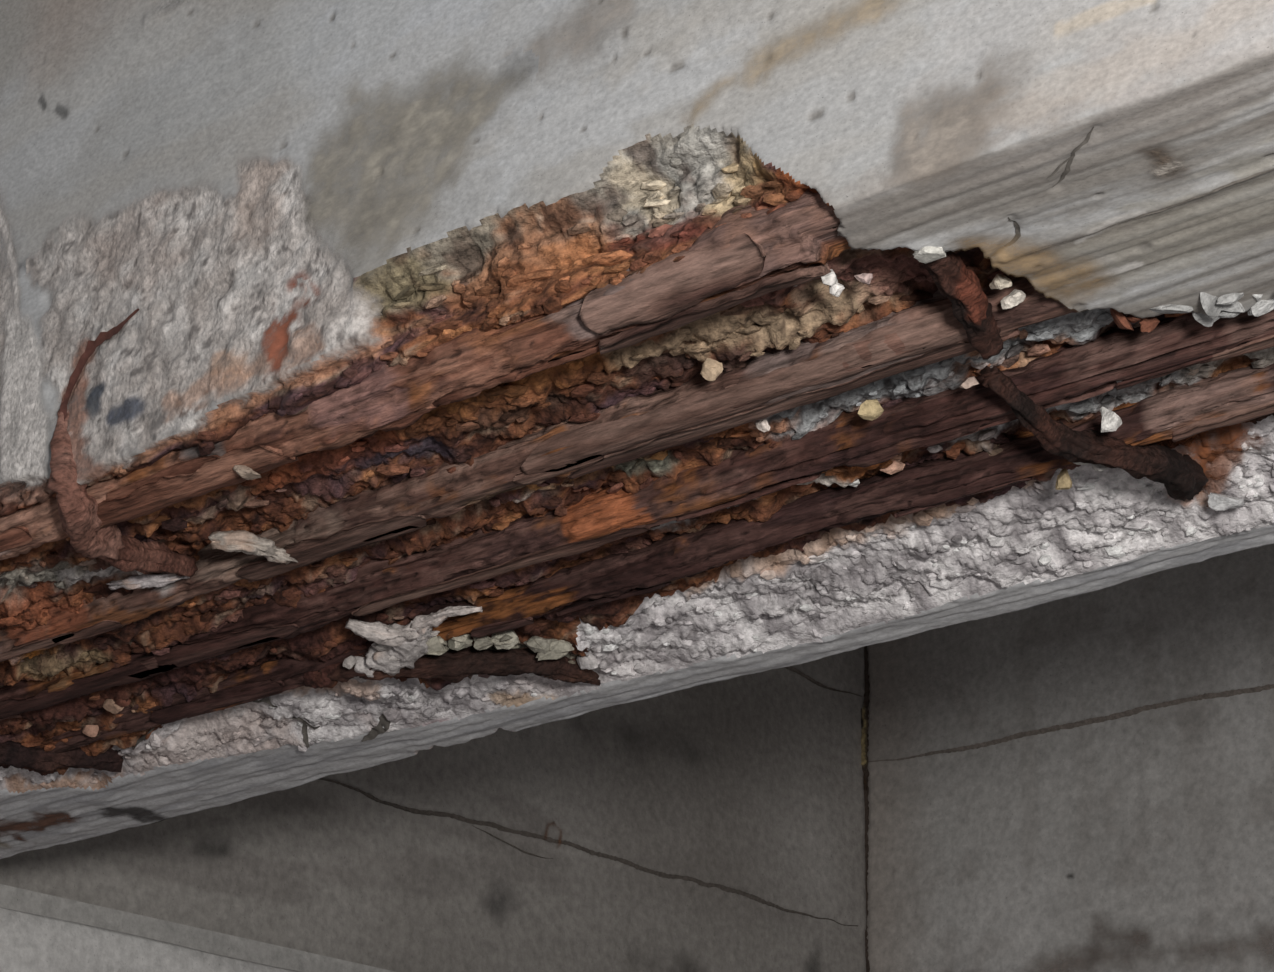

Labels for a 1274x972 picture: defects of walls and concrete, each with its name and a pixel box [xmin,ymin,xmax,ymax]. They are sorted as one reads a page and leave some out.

water stain [309,77,505,250]
crack [1047,127,1094,187]
spalling [1146,148,1181,176]
crack [1004,168,1274,255]
corrosion [262,275,319,370]
peeling [26,124,835,486]
corrosion [964,240,1101,293]
corrosion [1166,421,1248,493]
spalling [0,231,1274,794]
corrosion [0,813,74,841]
crack [319,646,1274,972]